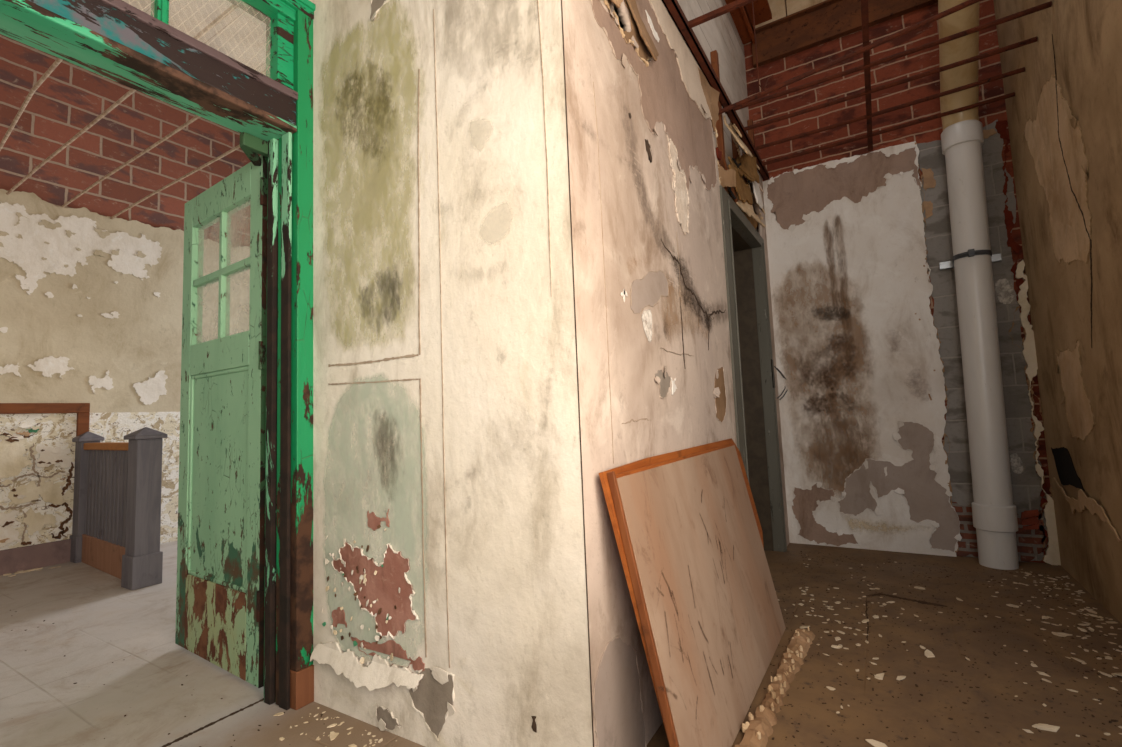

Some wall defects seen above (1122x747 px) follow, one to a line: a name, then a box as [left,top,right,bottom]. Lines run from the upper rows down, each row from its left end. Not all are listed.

peeling [1022,75,1092,265]
peeling [0,356,75,378]
peeling [0,201,162,299]
peeling [88,370,114,394]
peeling [133,370,168,405]
damp [381,276,399,319]
crack [660,239,725,366]
flaking render [591,0,978,558]
damp [781,217,873,494]
flaking render [982,120,1122,562]
peeling [0,424,74,548]
peeling [310,376,455,741]